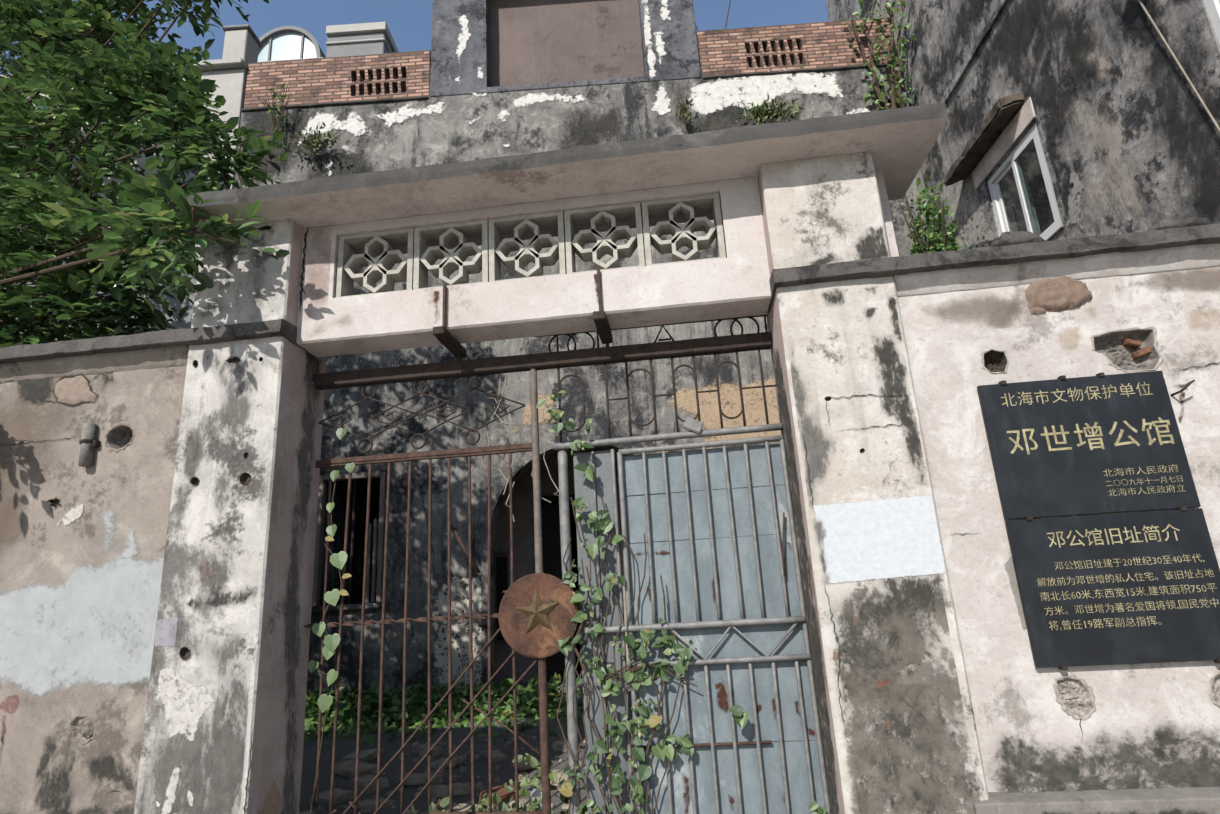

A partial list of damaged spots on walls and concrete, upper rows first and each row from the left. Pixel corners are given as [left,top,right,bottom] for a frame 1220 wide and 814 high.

peeling [455,15,471,84]
peeling [498,92,584,121]
mould [983,0,1106,226]
mould [1115,0,1220,221]
spalling [1090,326,1164,373]
damp [187,566,257,610]
damp [772,349,981,814]
damp [35,638,248,814]
peeling [156,767,193,814]
peeling [156,667,215,741]
spalling [1052,671,1096,721]
damp [996,728,1220,793]